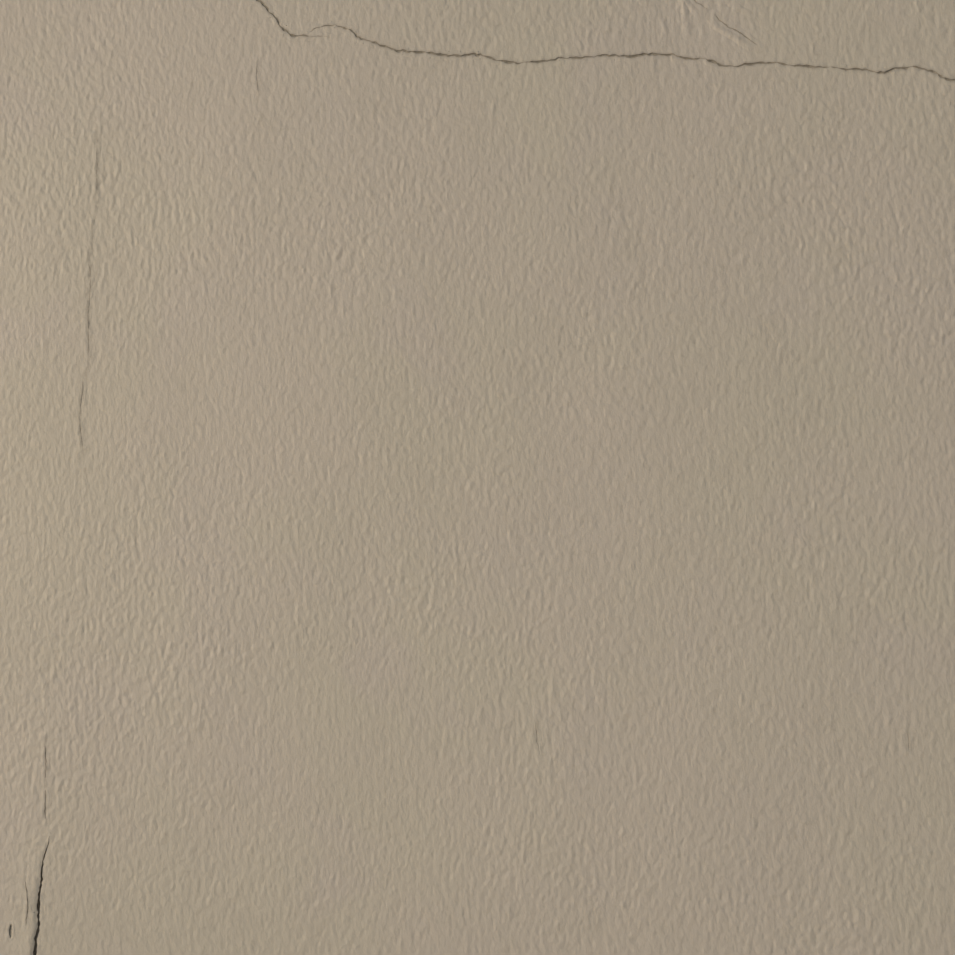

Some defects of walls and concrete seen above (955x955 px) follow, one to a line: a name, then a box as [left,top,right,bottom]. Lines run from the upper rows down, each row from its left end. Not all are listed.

crack [251,0,955,86]
crack [21,731,54,955]